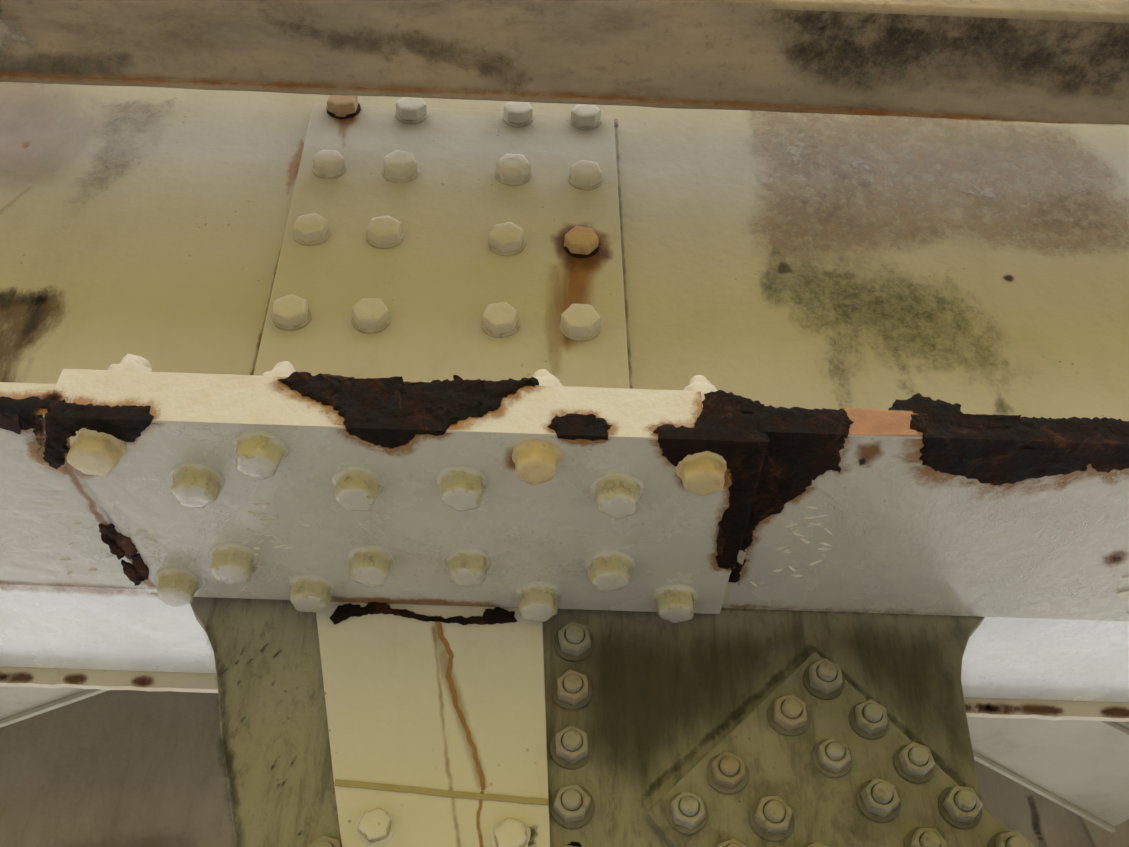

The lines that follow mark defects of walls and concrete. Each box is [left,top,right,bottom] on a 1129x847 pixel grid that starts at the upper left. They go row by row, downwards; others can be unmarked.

water stain [0,291,49,335]
water stain [764,260,996,369]
rust [0,390,157,476]
rust [273,371,543,455]
rust [888,393,1129,493]
rust [648,390,853,583]
rust [329,597,517,625]
rust [0,673,33,682]
crack [436,621,485,847]
rust [965,703,1062,715]
rust [1101,706,1129,718]
crack [1031,803,1044,845]